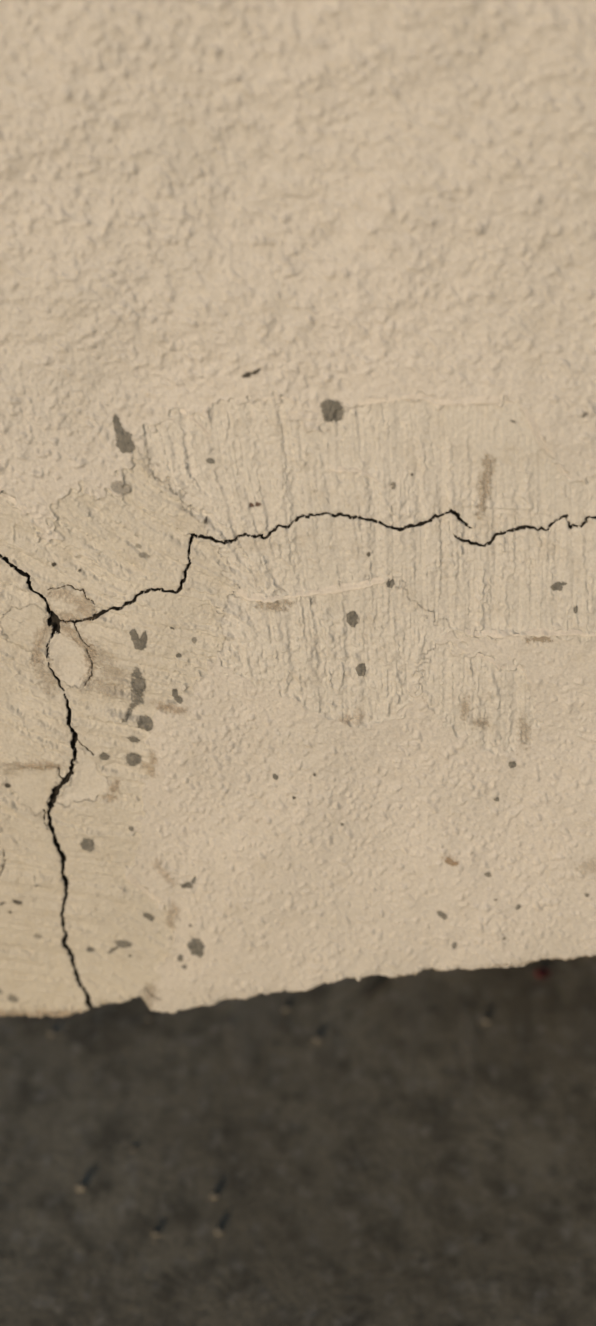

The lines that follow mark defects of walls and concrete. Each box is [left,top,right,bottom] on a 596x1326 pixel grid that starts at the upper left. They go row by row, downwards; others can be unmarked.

crack [0,509,596,1008]